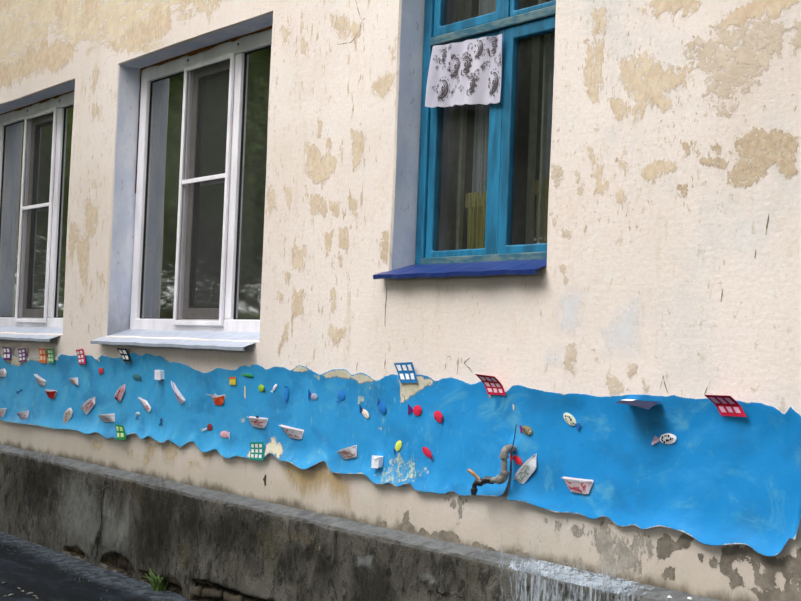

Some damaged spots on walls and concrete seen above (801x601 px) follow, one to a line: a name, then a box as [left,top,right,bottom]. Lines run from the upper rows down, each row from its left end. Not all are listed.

peeling [578,0,801,211]
peeling [0,0,222,332]
peeling [266,0,395,369]
peeling [549,139,641,240]
crack [192,579,273,601]
damp [499,550,654,601]
peeling [545,517,694,583]
peeling [698,545,801,601]